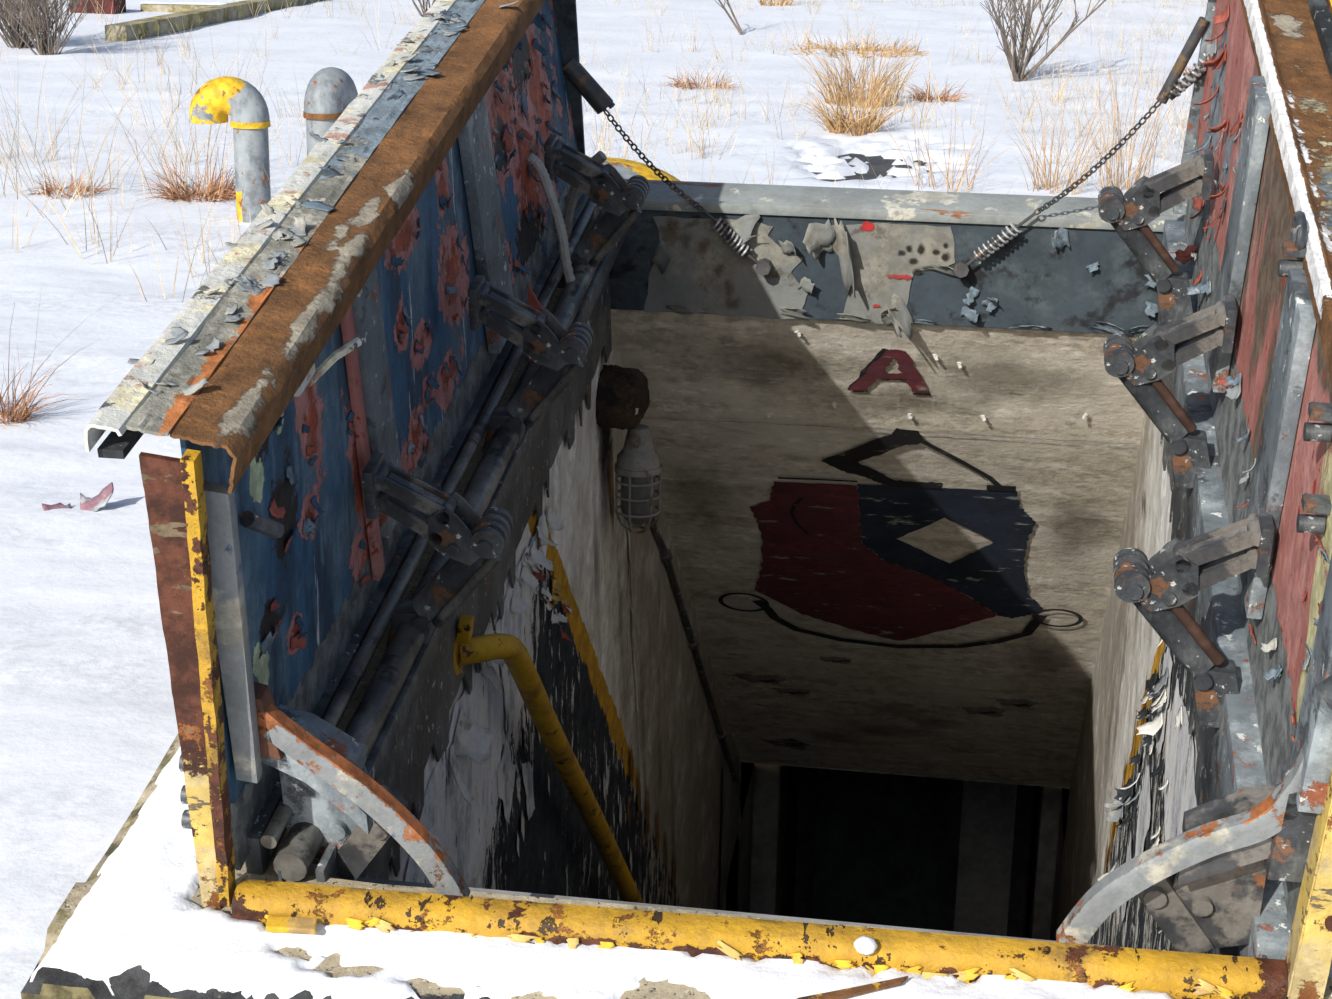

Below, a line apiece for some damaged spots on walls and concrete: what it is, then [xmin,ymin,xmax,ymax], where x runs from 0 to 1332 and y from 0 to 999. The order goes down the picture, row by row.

peeling [373,0,472,101]
peeling [1174,2,1244,295]
peeling [205,197,335,322]
peeling [644,214,957,341]
peeling [960,286,998,323]
peeling [1092,275,1159,337]
peeling [127,358,209,395]
peeling [1218,373,1241,400]
peeling [484,503,573,644]
peeling [1248,623,1282,681]
peeling [420,659,550,886]
rust [1122,675,1147,787]